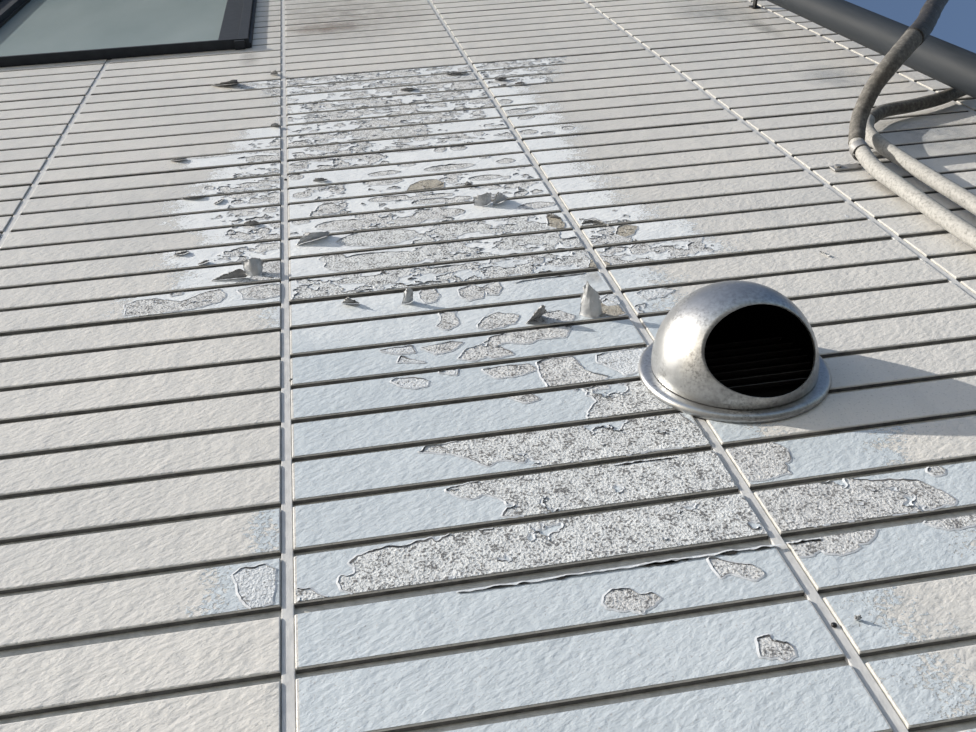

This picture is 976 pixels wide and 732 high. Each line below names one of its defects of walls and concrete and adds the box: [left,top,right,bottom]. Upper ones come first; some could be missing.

peeling [93,56,890,732]
crack [456,538,822,592]
peeling [709,419,976,725]